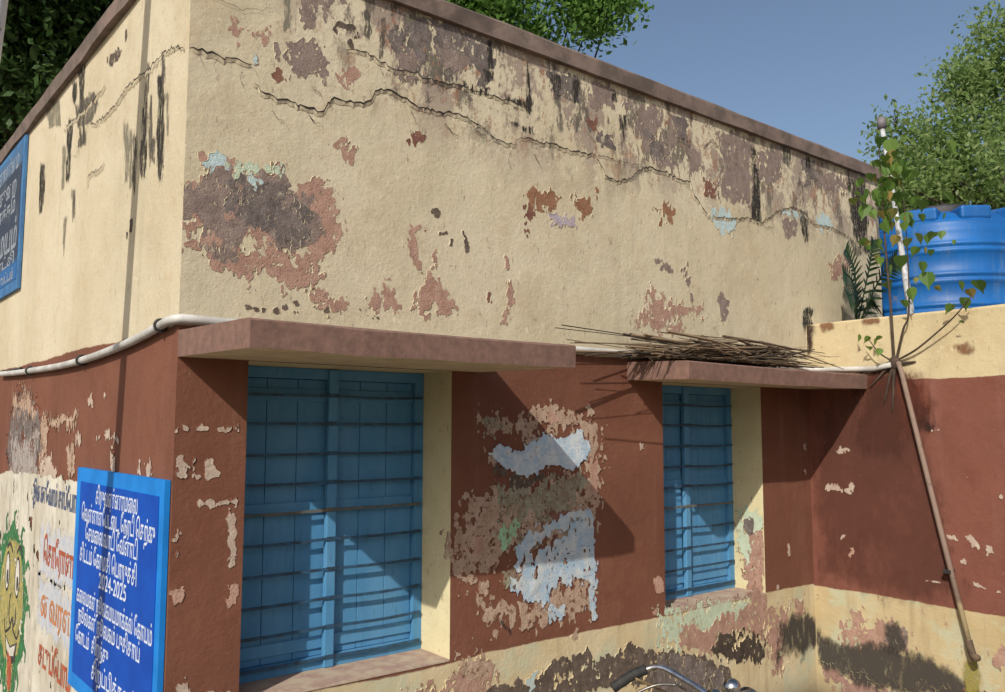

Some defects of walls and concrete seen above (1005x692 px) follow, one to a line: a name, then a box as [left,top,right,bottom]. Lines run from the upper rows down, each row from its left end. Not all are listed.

damp [46,65,98,257]
damp [123,53,169,193]
peeling [228,0,361,90]
peeling [181,150,459,322]
spalling [386,17,497,90]
crack [64,20,849,239]
peeling [523,185,599,238]
peeling [546,68,852,241]
peeling [4,381,106,499]
peeling [196,496,238,569]
spalling [415,505,805,692]
damp [777,613,967,692]